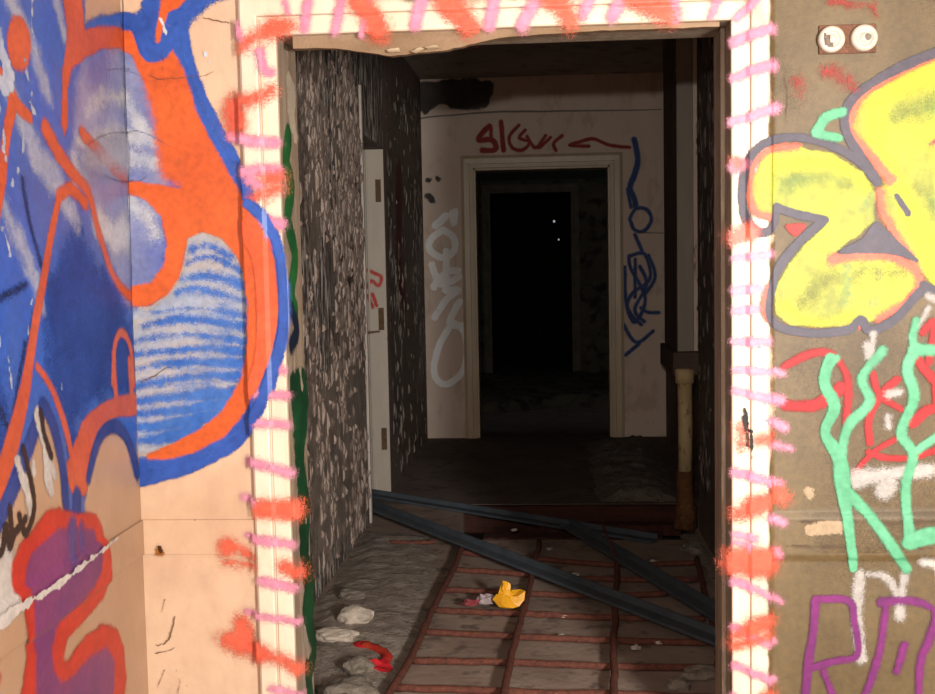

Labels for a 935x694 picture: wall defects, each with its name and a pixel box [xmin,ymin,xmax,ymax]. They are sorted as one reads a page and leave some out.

leakage [477,170,606,185]
leakage [733,0,935,694]